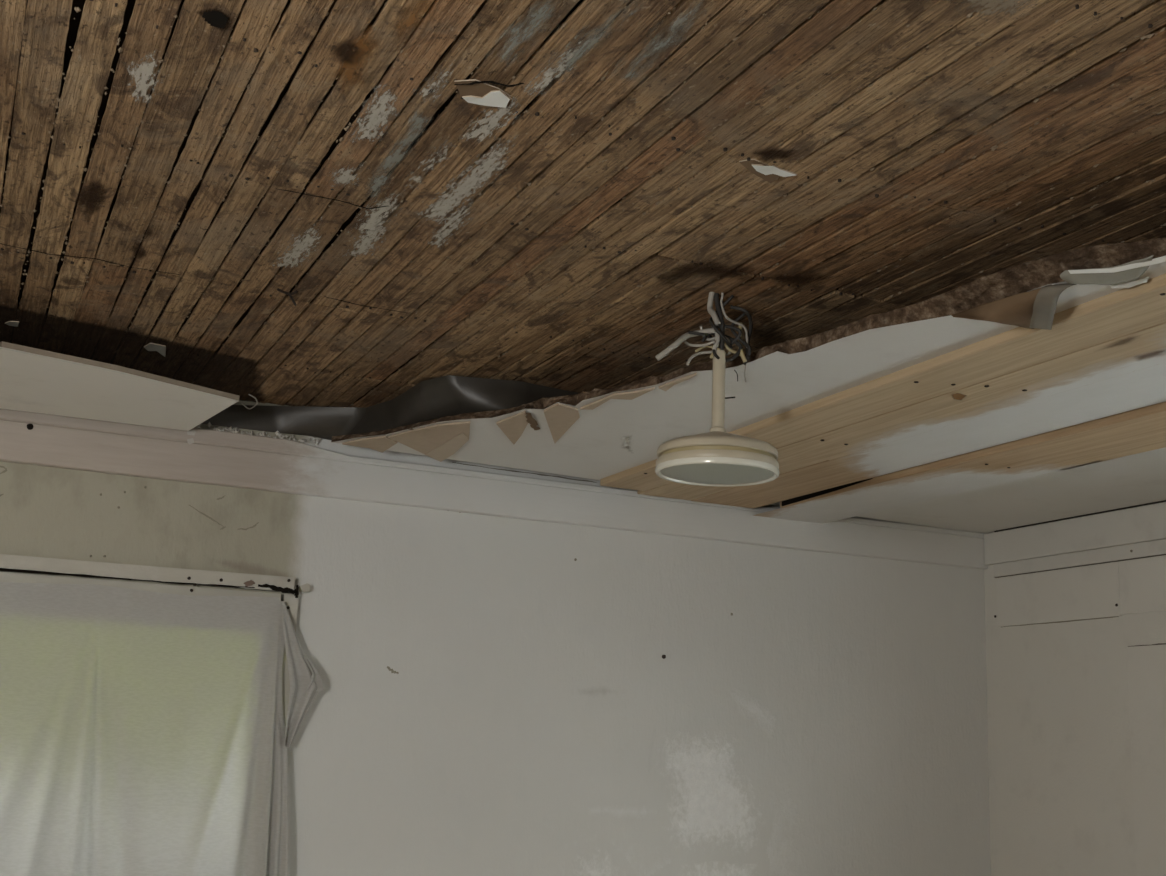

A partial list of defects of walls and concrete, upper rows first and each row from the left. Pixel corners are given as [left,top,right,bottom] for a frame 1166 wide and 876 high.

water stain [332,42,358,63]
spalling [331,238,1166,442]